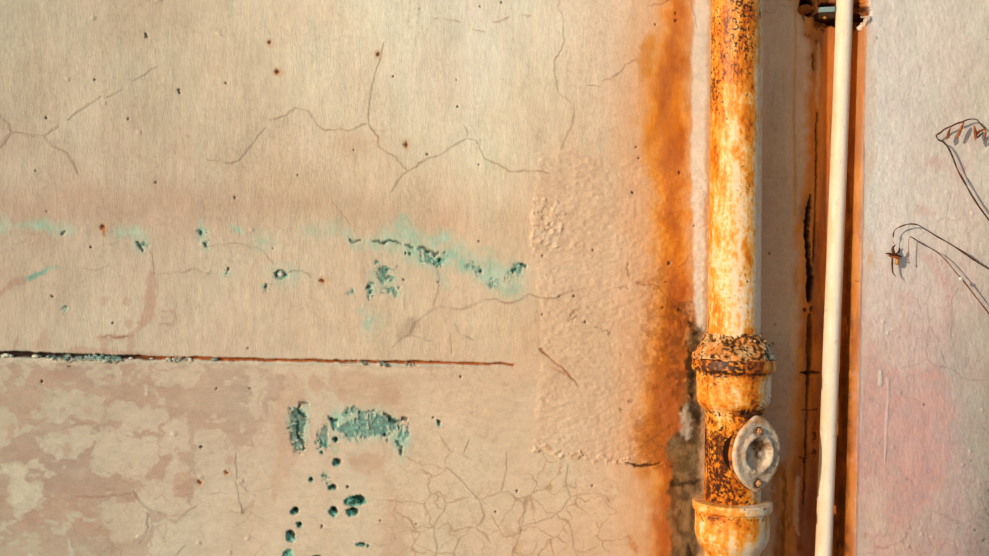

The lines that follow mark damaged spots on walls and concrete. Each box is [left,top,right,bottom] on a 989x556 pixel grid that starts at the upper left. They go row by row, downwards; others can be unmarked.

crack [0,66,157,175]
crack [205,42,550,192]
peeling [107,222,153,257]
peeling [260,247,306,294]
crack [0,268,586,369]
peeling [339,211,533,345]
rust [593,0,708,556]
peeling [0,457,48,519]
peeling [284,398,414,489]
crack [403,436,611,556]
leakage [659,307,706,556]
rust [733,410,764,420]